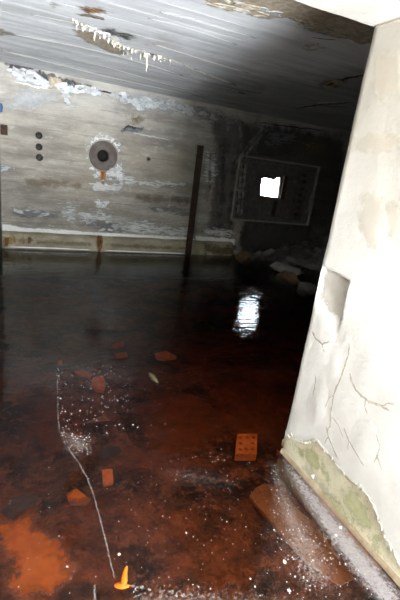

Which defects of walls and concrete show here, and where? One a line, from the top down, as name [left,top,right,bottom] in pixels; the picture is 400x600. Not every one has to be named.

peeling [205,0,375,44]
peeling [7,66,102,107]
peeling [110,92,196,116]
peeling [281,431,400,578]